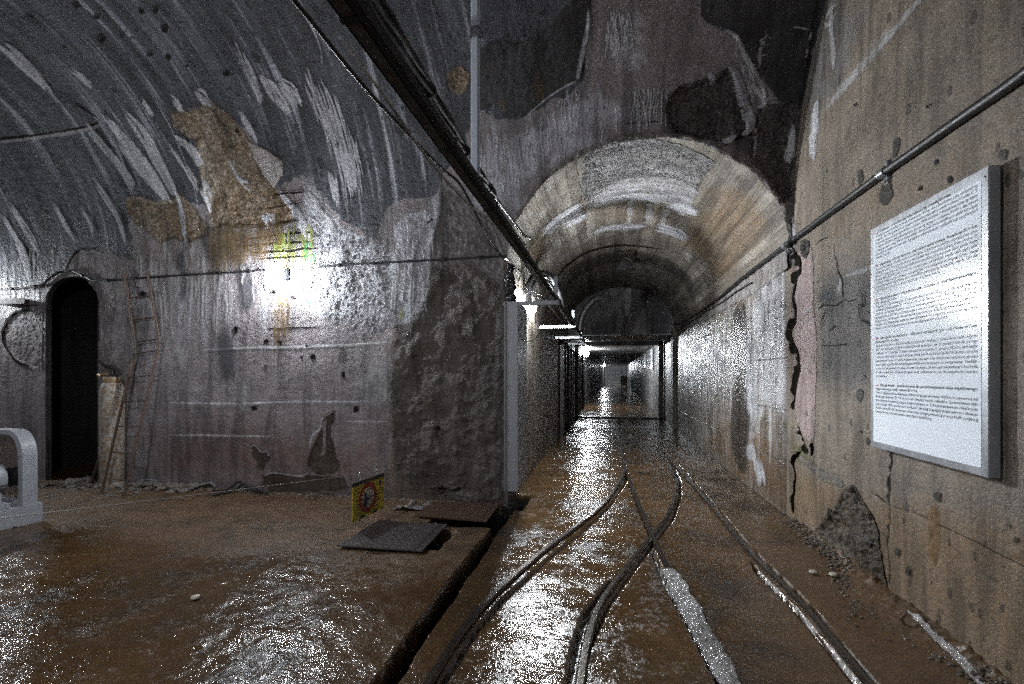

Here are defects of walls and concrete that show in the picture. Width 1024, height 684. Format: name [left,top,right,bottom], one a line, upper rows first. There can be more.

spalling [126,102,296,244]
crack [785,237,871,514]
spalling [251,411,348,495]
spalling [814,485,888,586]
crack [874,452,1024,583]